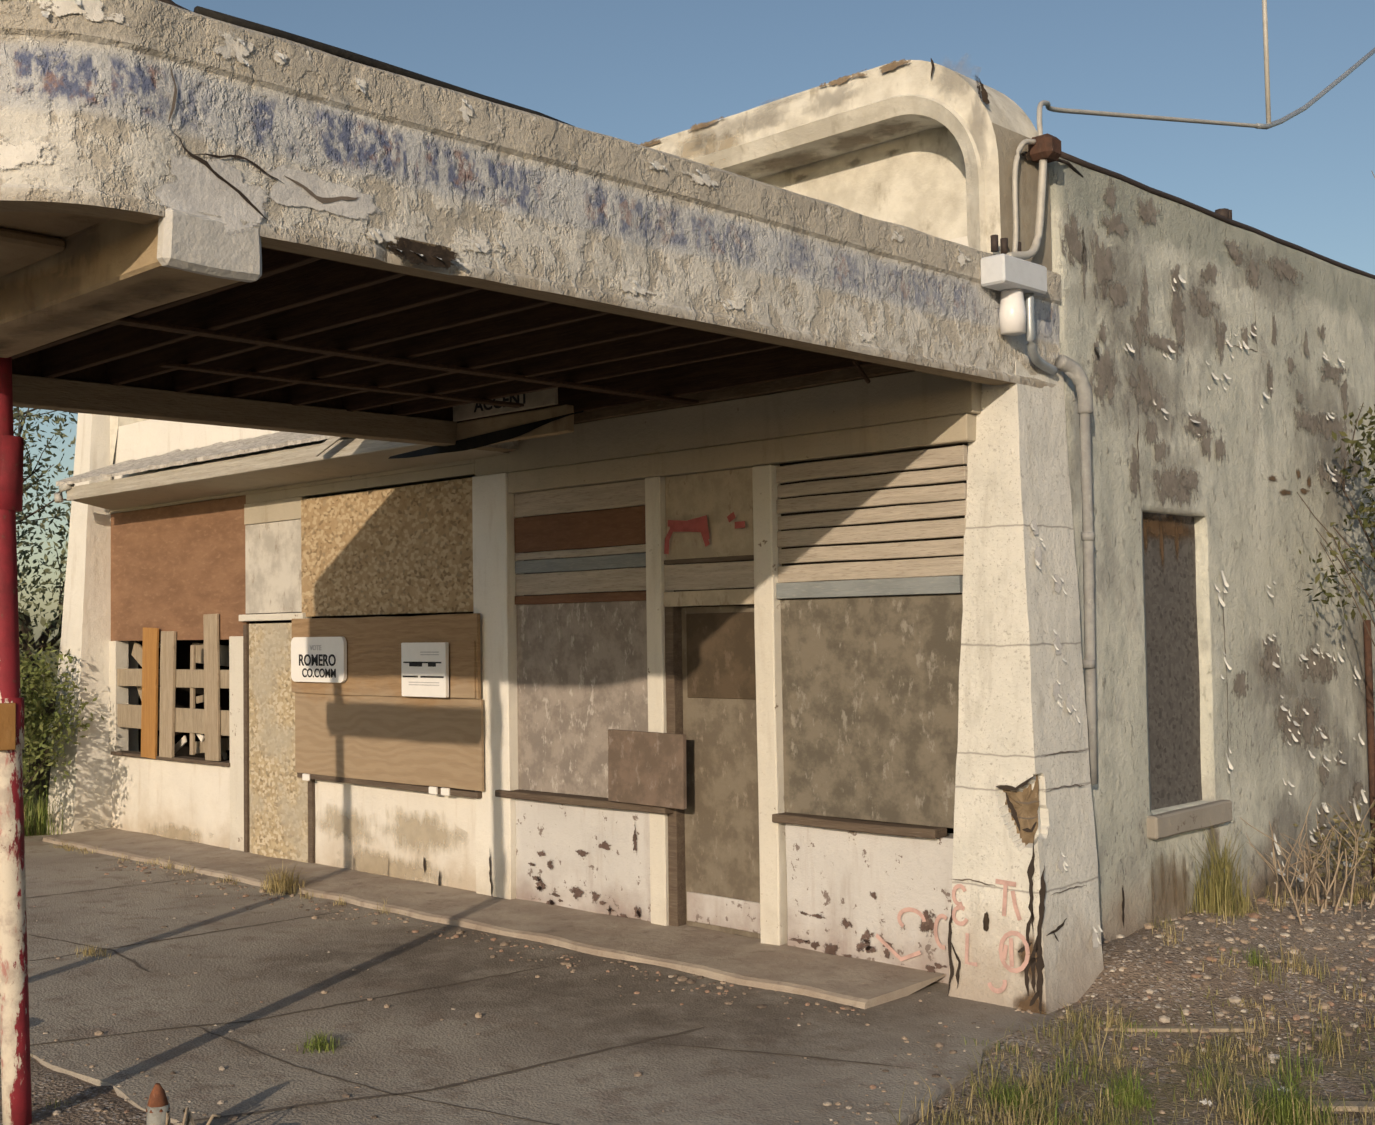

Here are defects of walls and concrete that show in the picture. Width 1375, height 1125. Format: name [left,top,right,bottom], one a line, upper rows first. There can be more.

peeling [35,0,129,26]
peeling [0,137,66,171]
crack [168,65,360,220]
peeling [154,153,503,270]
peeling [1061,176,1277,508]
peeling [1261,326,1353,442]
corrosion [1143,513,1193,565]
peeling [1220,634,1368,893]
peeling [528,850,641,918]
peeling [789,918,893,958]
peeling [919,910,936,932]
crack [948,842,1087,1014]